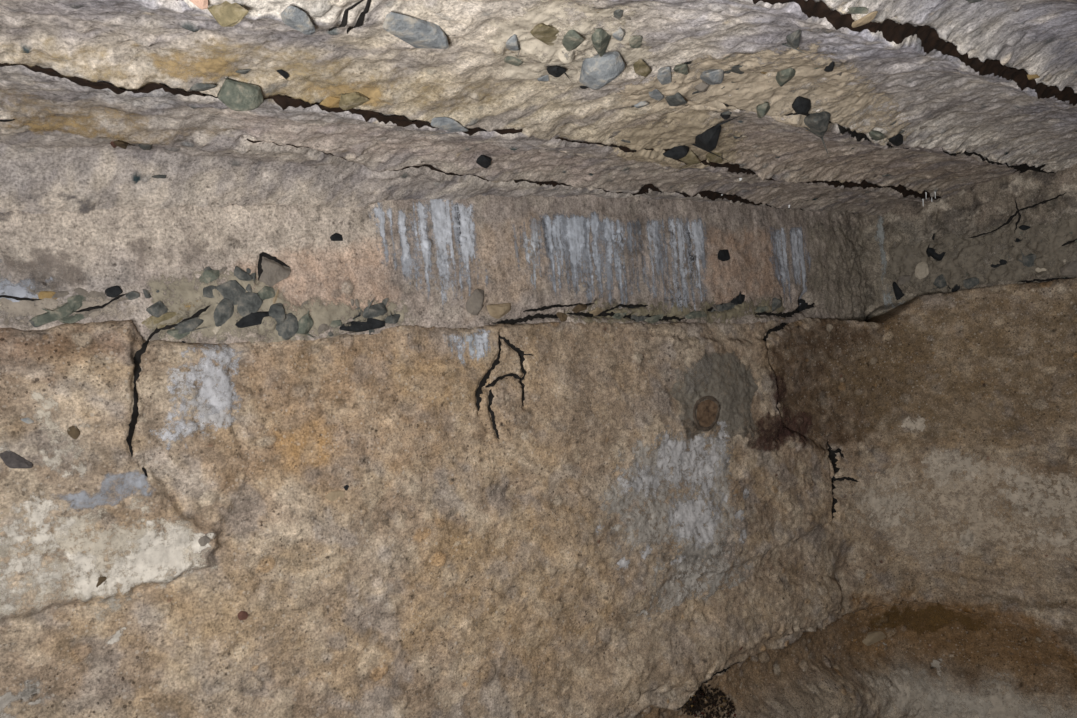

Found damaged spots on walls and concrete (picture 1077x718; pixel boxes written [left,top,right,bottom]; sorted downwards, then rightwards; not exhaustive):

crack [0,63,218,98]
crack [263,94,436,128]
crack [329,0,371,34]
crack [463,128,522,136]
crack [393,137,941,211]
crack [753,0,1077,106]
efflorescence [373,199,488,303]
efflorescence [512,211,707,311]
efflorescence [769,227,811,305]
crack [126,305,210,477]
crack [475,303,723,439]
leakage [596,352,812,621]